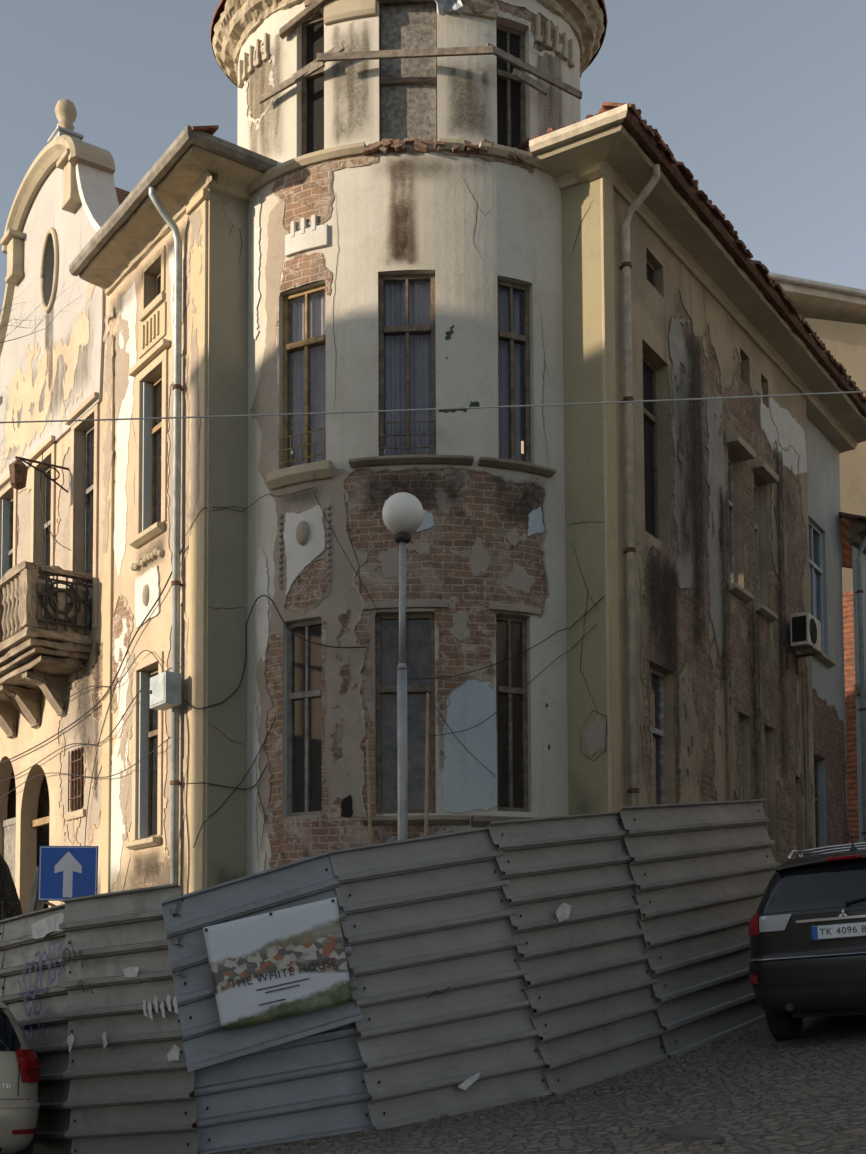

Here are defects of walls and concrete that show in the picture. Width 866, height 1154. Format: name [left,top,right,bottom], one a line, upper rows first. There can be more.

flaking render [223,138,535,355]
flaking render [250,466,549,875]
flaking render [636,286,850,867]